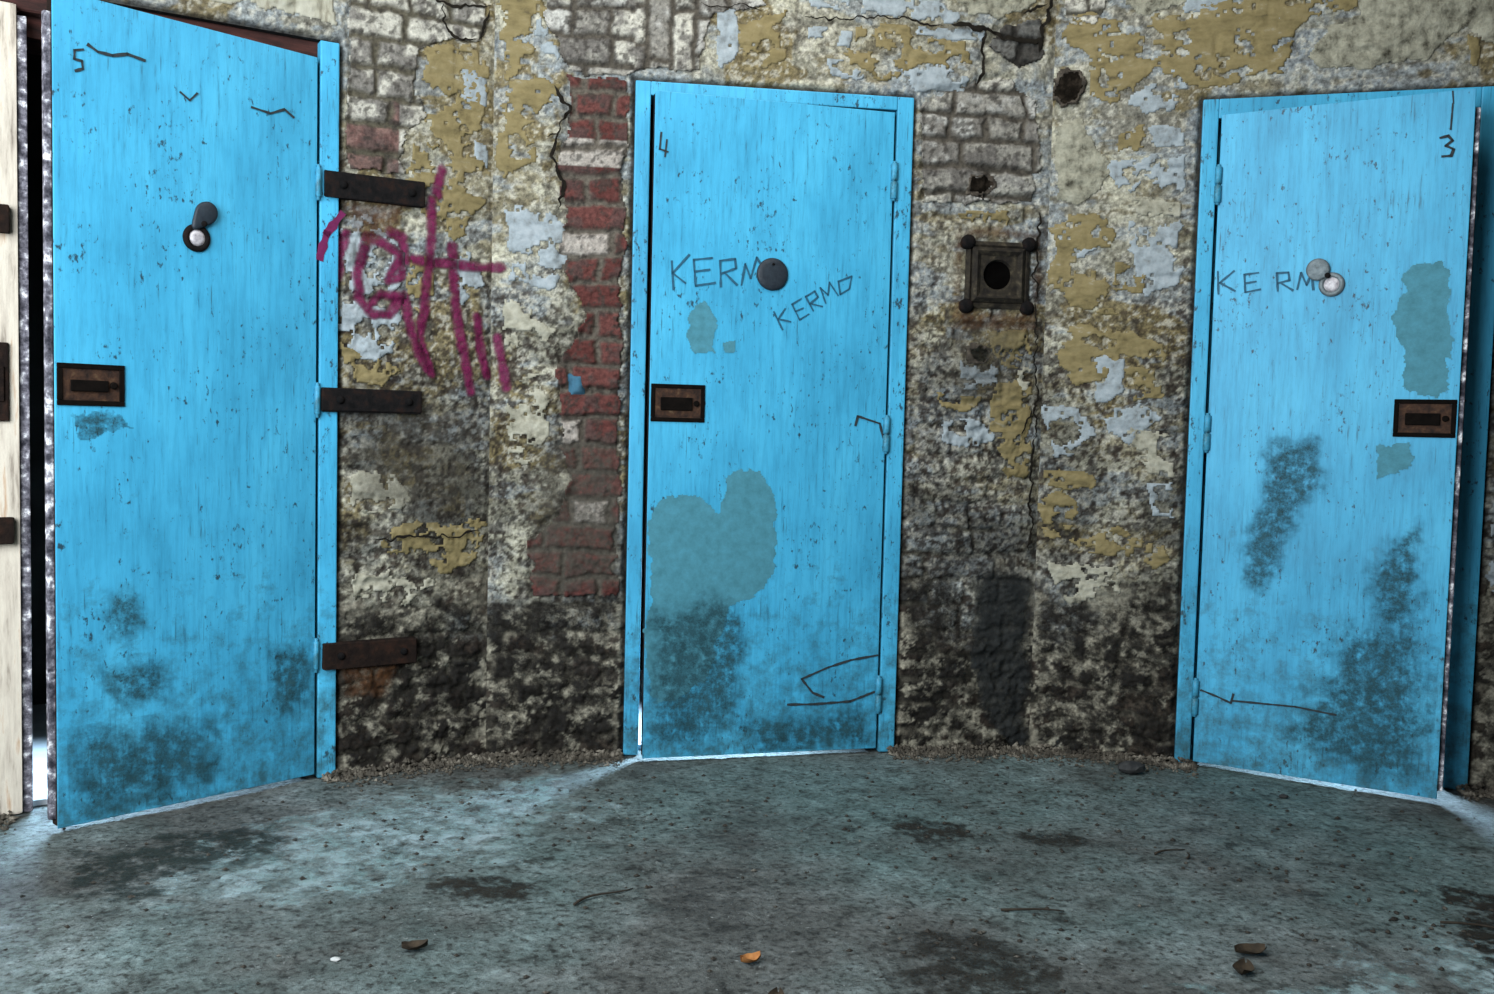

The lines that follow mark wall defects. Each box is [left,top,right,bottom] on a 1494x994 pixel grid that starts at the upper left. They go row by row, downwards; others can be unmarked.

crack [701,2,761,11]
crack [805,0,1053,84]
flaking render [338,0,787,606]
peeling [808,0,1358,605]
peeling [1391,261,1455,398]
peeling [75,413,126,439]
peeling [1376,442,1415,479]
damp [335,595,617,765]
damp [904,571,992,746]
damp [1033,589,1175,757]